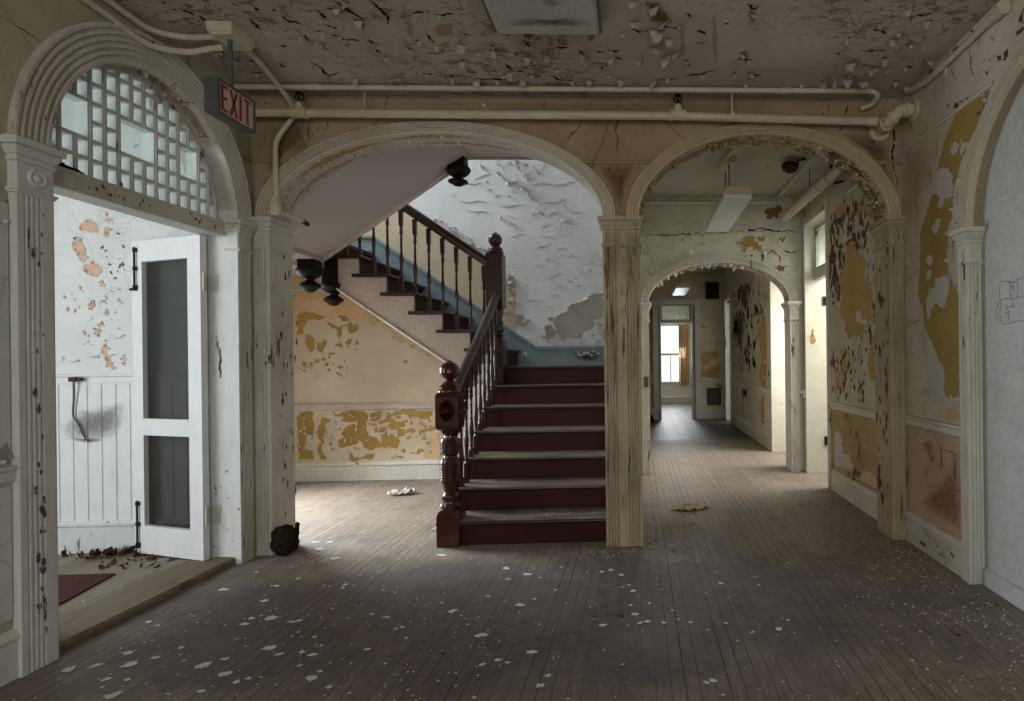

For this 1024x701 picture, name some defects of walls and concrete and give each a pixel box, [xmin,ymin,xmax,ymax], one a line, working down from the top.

peeling [232,0,713,89]
peeling [817,7,934,91]
peeling [62,210,126,370]
peeling [278,294,432,380]
peeling [630,302,654,423]
peeling [657,236,787,287]
peeling [733,282,767,426]
peeling [800,142,888,505]
peeling [918,49,1008,421]
peeling [283,409,440,494]
spalling [34,486,47,534]
spalling [36,553,46,614]